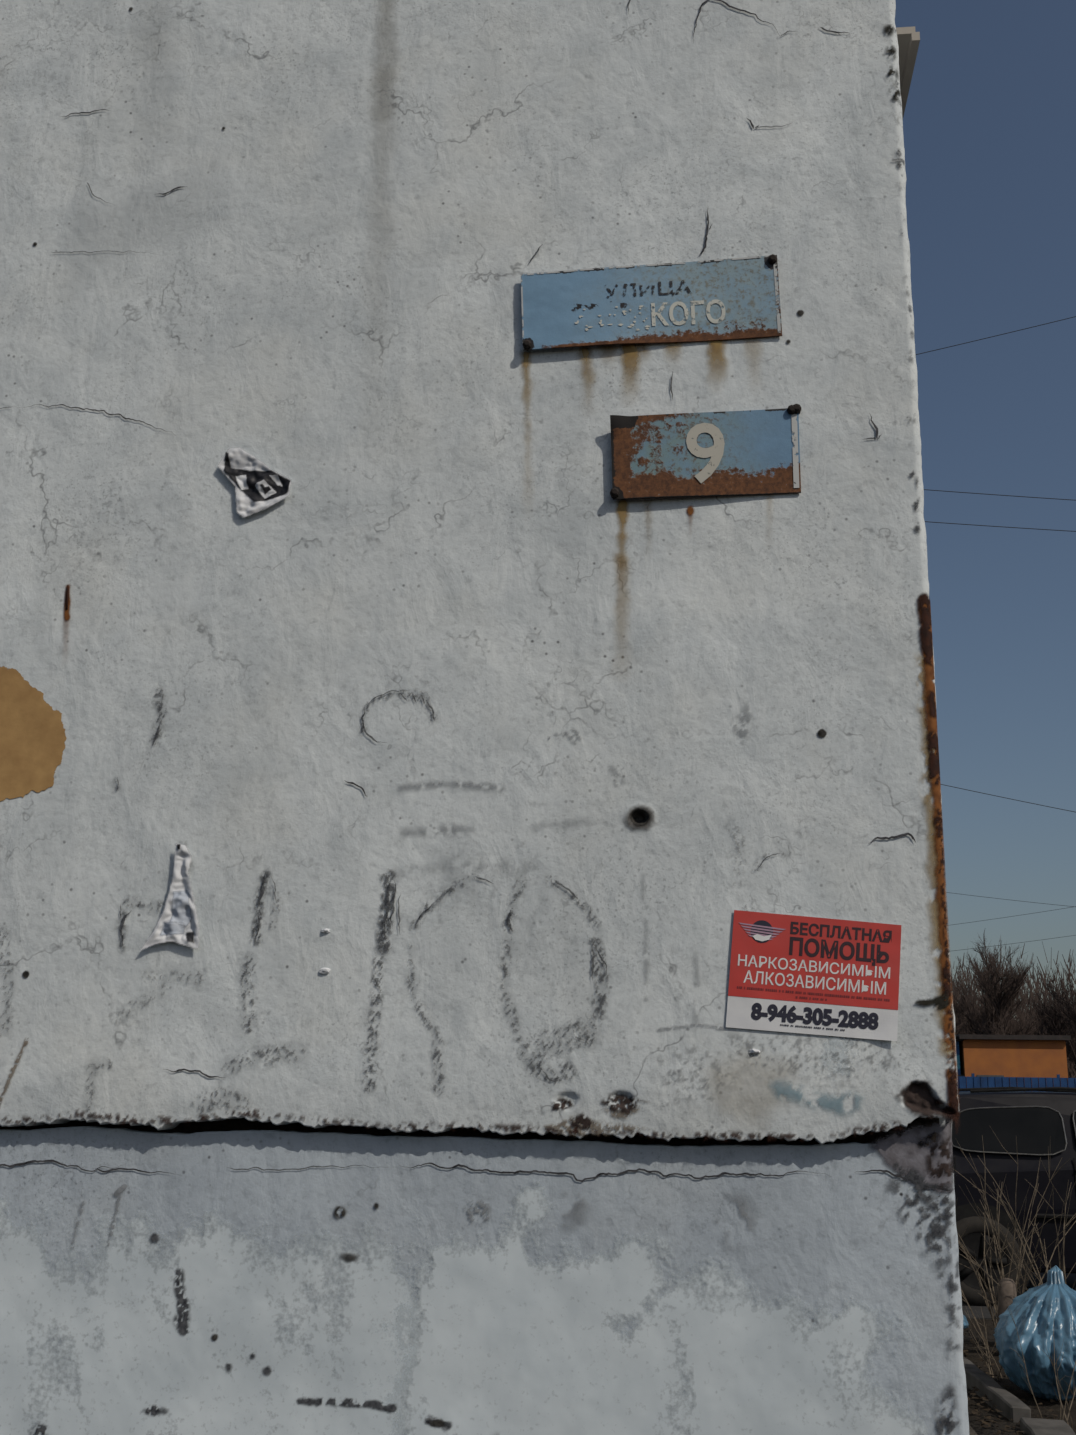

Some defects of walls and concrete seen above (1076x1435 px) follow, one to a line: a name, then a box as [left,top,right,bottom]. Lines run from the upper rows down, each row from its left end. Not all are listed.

crack [693,0,848,37]
corrosion [918,593,960,1120]
spalling [915,992,949,1009]
crack [0,1160,173,1174]
crack [230,1163,950,1191]
spalling [842,1080,959,1323]
peeling [936,1387,959,1435]